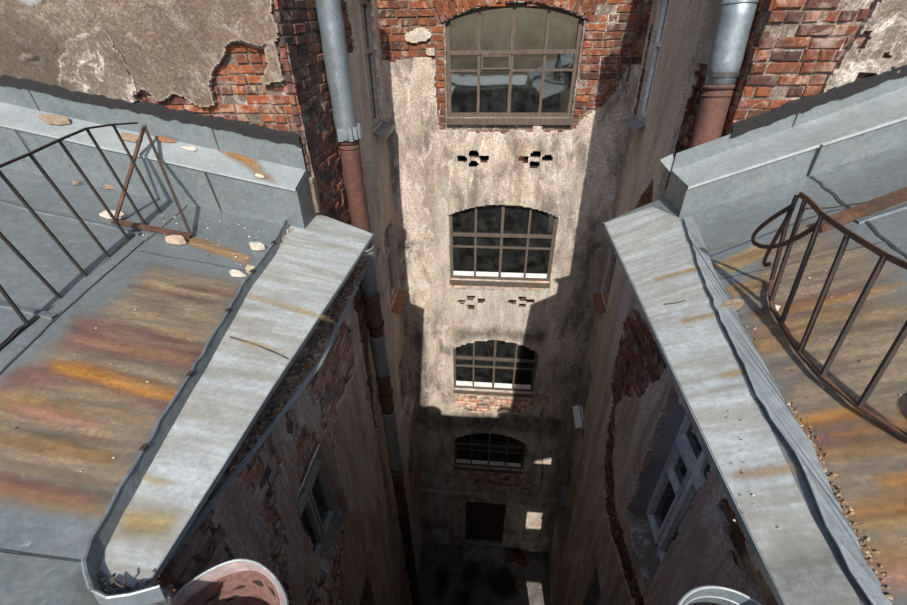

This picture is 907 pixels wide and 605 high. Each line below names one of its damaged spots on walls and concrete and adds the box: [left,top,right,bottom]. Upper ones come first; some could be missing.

flaking render [57,27,306,136]
flaking render [377,0,506,129]
flaking render [544,0,653,133]
flaking render [822,0,907,93]
rust [713,247,767,270]
rust [0,273,237,505]
flaking render [455,395,533,415]
flaking render [604,309,667,605]
rust [726,228,907,577]